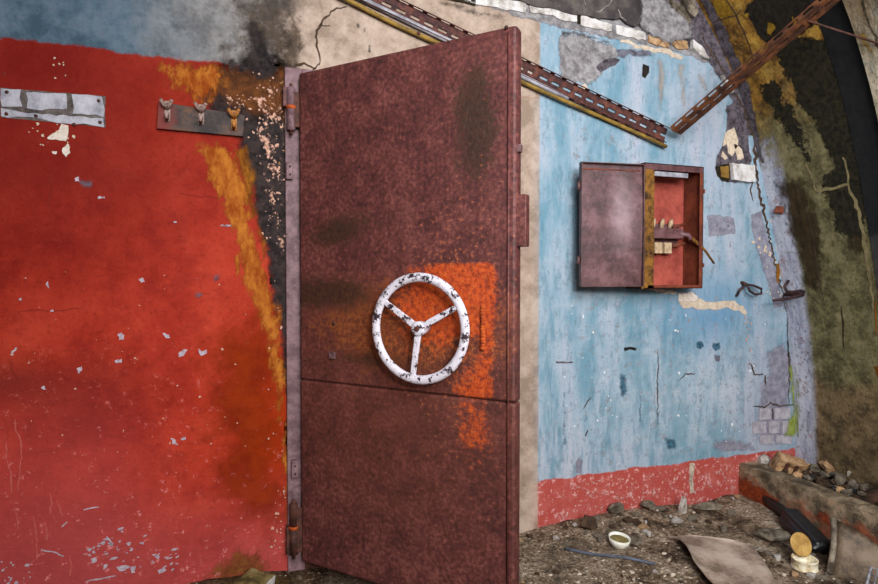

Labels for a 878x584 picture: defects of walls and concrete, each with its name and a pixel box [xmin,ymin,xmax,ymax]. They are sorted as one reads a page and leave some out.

crack [295,6,347,70]
flaking render [0,88,106,157]
corrosion [159,62,285,120]
flaking render [444,0,765,183]
leakage [776,178,823,290]
leakage [847,235,864,254]
corrosion [198,142,288,556]
flaking render [552,189,794,548]
peeling [83,527,179,574]